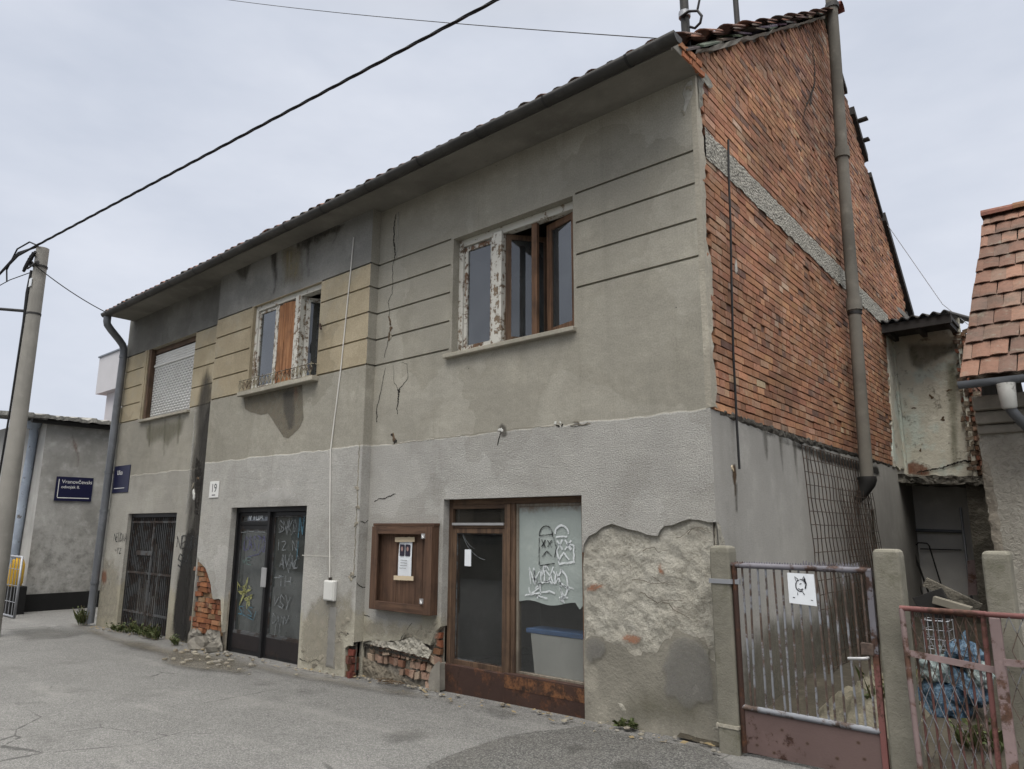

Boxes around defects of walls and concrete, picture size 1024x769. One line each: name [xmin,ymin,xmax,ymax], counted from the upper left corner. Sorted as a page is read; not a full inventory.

crack [376,215,408,422]
damp [244,385,304,438]
damp [174,374,211,642]
flaking render [187,560,230,652]
flaking render [300,598,446,693]
rust [504,674,585,703]
flaking render [583,519,725,742]